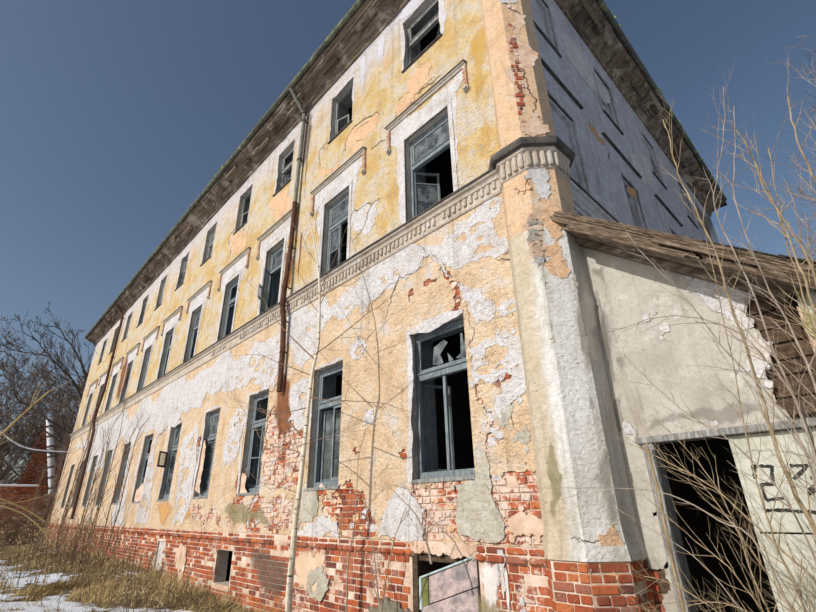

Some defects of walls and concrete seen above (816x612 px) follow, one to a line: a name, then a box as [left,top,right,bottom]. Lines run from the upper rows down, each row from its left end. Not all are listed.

peeling [406,62,434,94]
spalling [499,0,550,137]
crack [522,69,537,113]
peeling [512,168,571,285]
corrosion [274,374,291,460]
peeling [76,197,543,548]
peeling [685,276,774,389]